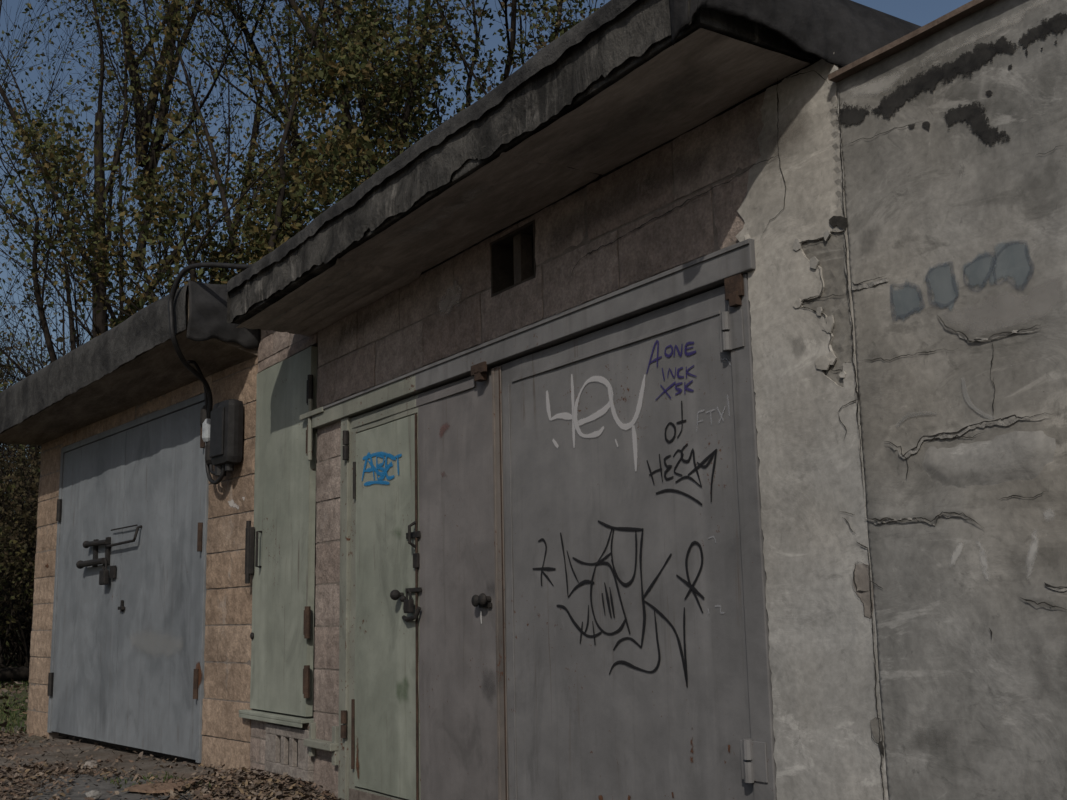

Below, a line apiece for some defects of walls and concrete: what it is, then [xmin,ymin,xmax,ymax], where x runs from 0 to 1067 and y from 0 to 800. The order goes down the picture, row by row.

water stain [851,75,899,95]
spalling [793,216,888,386]
crack [570,71,1054,800]
spalling [852,562,874,619]